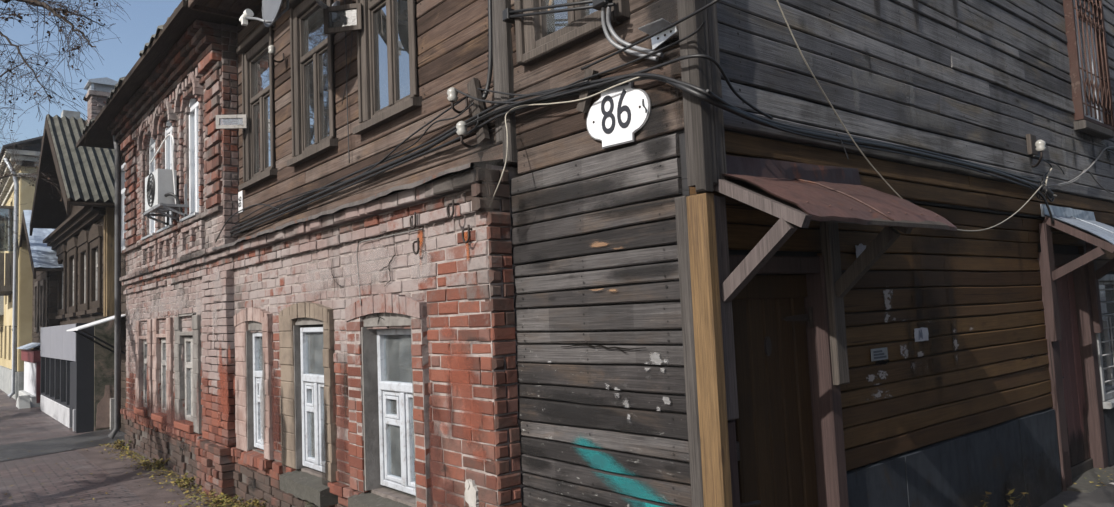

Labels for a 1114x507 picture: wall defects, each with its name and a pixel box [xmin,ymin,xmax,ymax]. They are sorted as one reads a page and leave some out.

peeling [883,286,908,322]
peeling [645,352,667,373]
peeling [866,370,892,401]